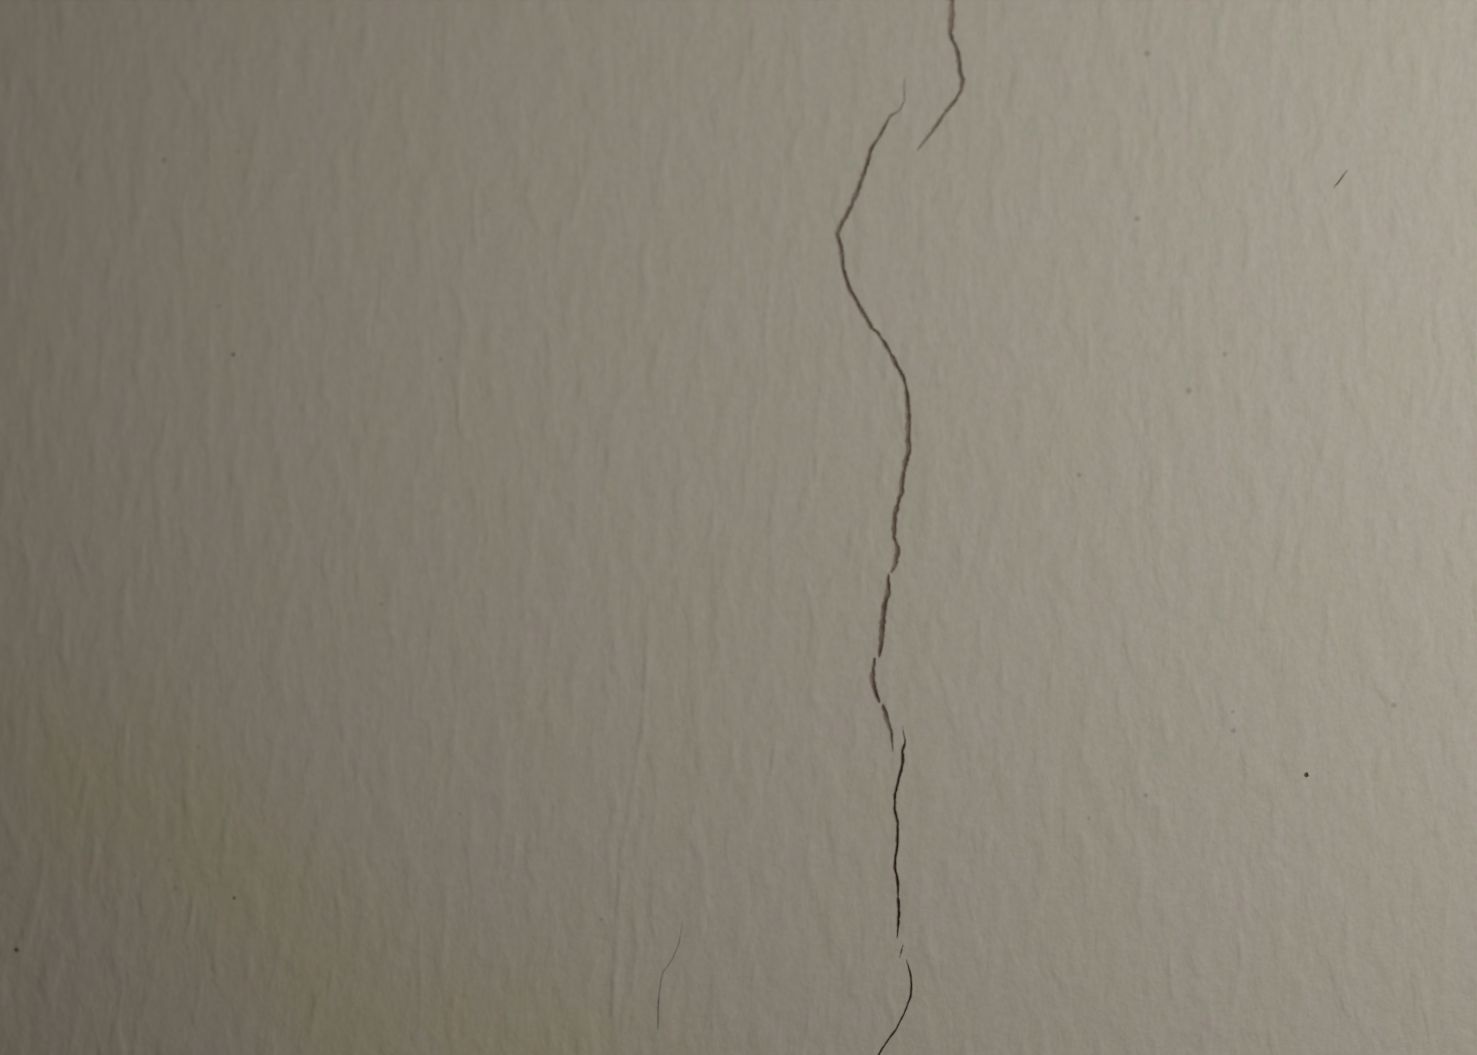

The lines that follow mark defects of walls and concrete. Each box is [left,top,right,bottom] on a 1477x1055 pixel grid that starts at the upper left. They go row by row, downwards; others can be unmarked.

crack [917,0,965,151]
crack [835,80,913,1055]